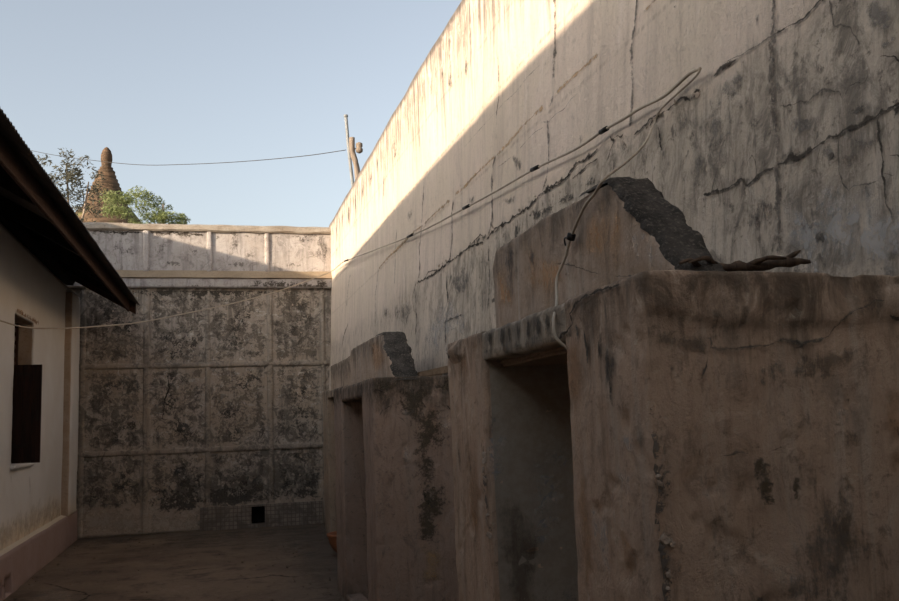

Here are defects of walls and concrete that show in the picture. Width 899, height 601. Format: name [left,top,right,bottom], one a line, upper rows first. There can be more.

crack [622,0,637,150]
spalling [634,89,700,150]
crack [703,0,899,252]
leakage [868,3,894,47]
crack [445,203,461,359]
spalling [418,149,597,283]
leakage [529,193,573,220]
crack [702,300,899,376]
leakage [375,377,449,540]
leakage [489,362,579,601]
leakage [754,459,774,502]